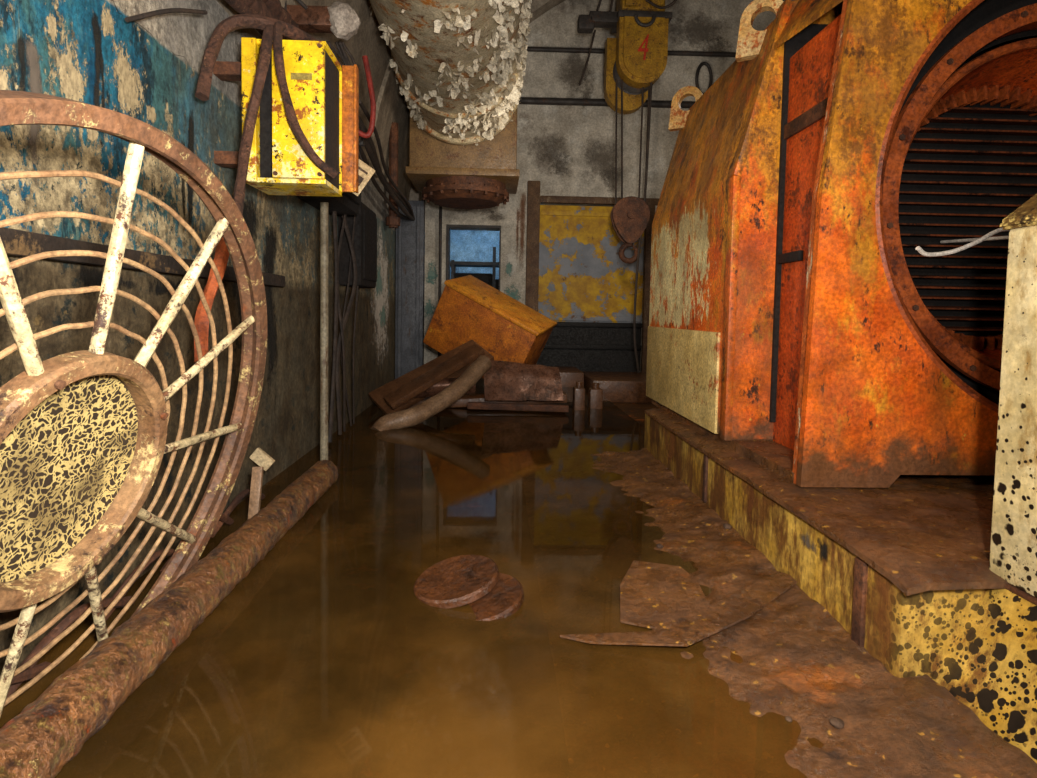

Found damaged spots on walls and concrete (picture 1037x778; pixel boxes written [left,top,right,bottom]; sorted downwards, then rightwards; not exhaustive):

peeling [0,69,10,90]
peeling [44,13,88,102]
peeling [101,1,174,138]
peeling [87,129,99,145]
peeling [152,155,188,198]